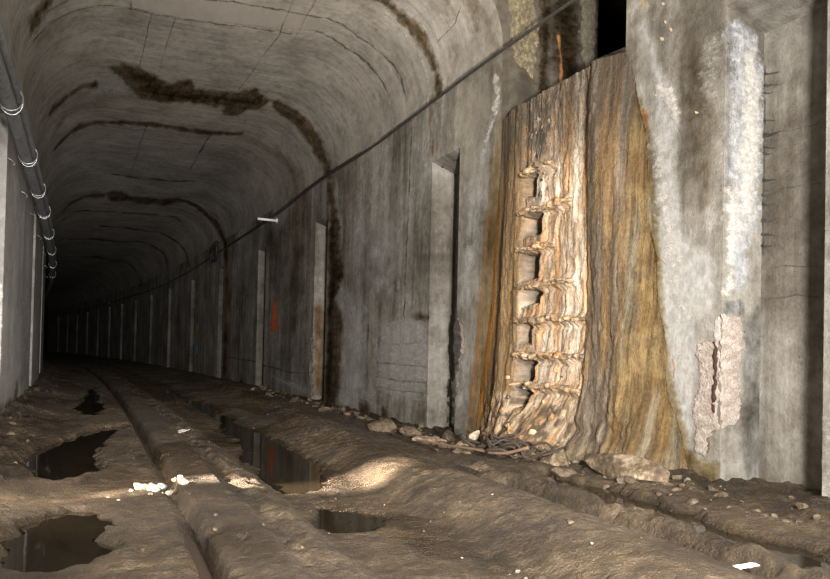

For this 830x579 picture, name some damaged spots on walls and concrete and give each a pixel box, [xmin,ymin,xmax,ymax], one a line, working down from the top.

damp [377,0,445,125]
peeling [509,0,539,77]
damp [88,65,360,404]
damp [640,24,714,448]
spalling [692,313,745,458]